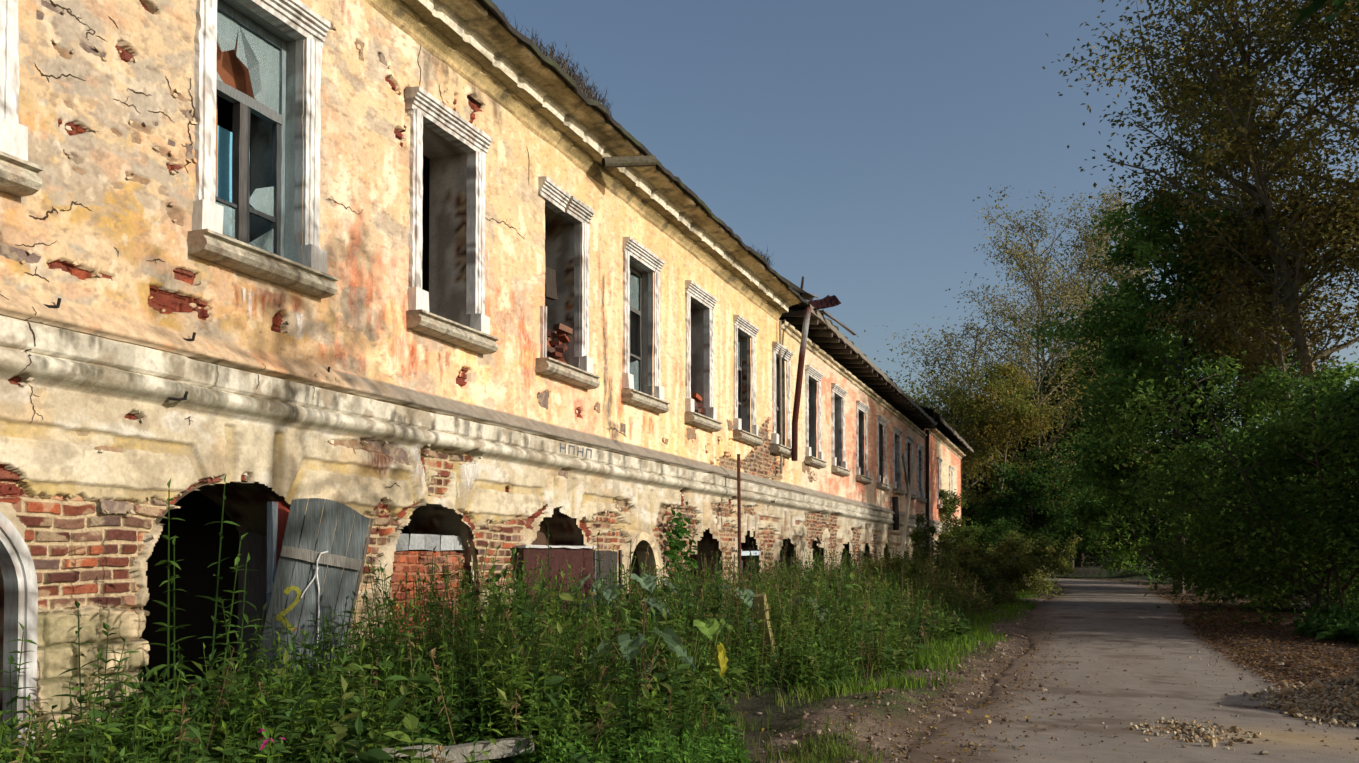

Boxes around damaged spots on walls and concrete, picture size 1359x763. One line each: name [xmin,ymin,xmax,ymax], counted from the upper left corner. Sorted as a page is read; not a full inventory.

crack [50,0,118,41]
peeling [50,39,138,62]
spalling [58,101,197,176]
crack [0,201,93,423]
peeling [0,243,112,281]
spalling [148,267,213,321]
spalling [456,367,468,388]
spalling [686,418,786,483]
spalling [0,464,220,613]
spalling [328,438,482,592]
spalling [579,500,635,563]
spalling [652,490,776,579]